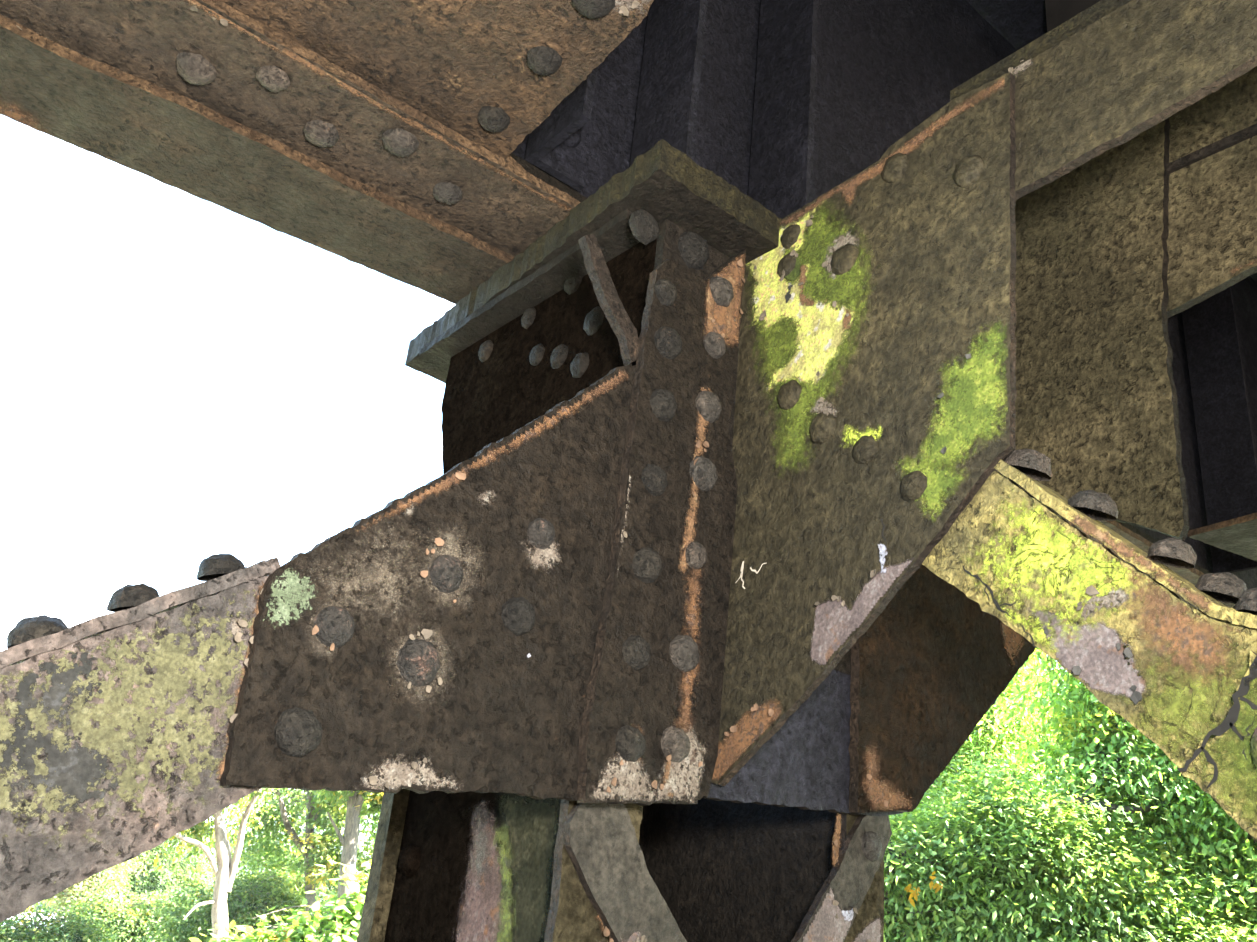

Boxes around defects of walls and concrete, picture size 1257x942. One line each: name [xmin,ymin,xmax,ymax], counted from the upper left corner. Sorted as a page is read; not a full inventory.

corrosion [706,254,745,344]
corrosion [694,413,709,465]
corrosion [678,480,700,641]
peeling [810,544,914,665]
corrosion [593,668,781,803]
crack [1177,656,1257,788]